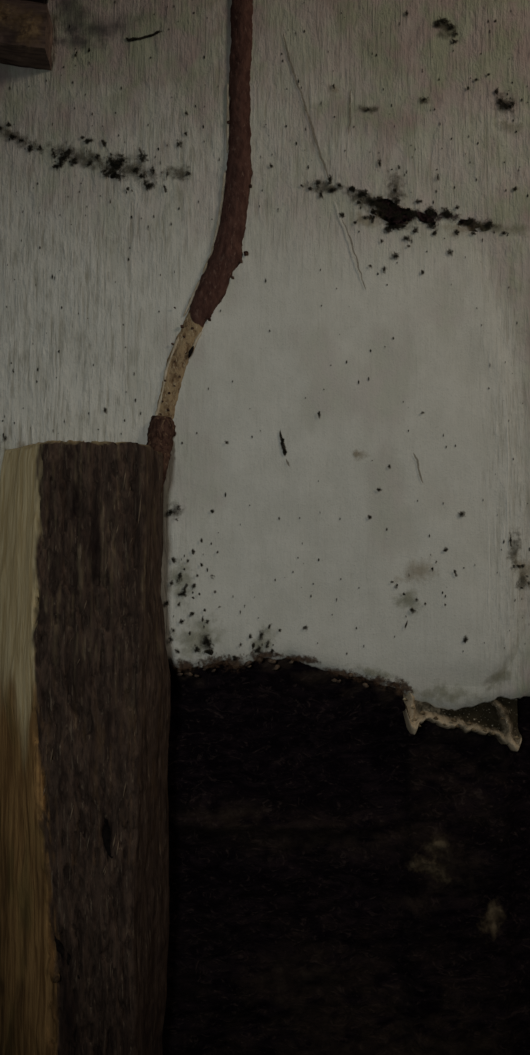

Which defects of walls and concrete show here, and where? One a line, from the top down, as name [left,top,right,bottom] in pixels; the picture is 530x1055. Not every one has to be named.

damp [0,121,190,194]
crack [283,34,365,287]
damp [301,159,509,286]
damp [164,532,219,653]
damp [232,617,281,660]
flaking render [162,657,530,1055]